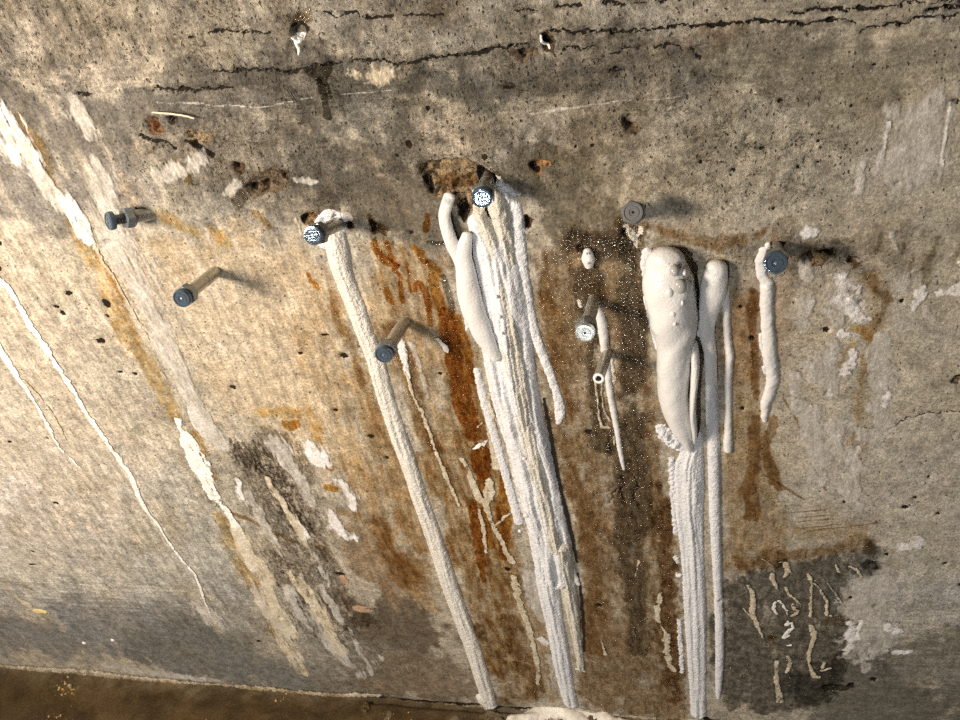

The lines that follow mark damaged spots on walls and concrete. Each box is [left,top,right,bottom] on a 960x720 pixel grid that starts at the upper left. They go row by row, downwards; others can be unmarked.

leakage [69,92,96,140]
crack [138,133,178,150]
leakage [306,64,332,120]
crack [152,0,960,94]
leakage [0,101,374,679]
leakage [397,339,460,507]
rust [372,239,511,583]
leakage [566,234,649,392]
leakage [459,396,557,699]
leakage [577,382,683,716]
leakage [709,538,921,715]
leakage [896,535,927,553]